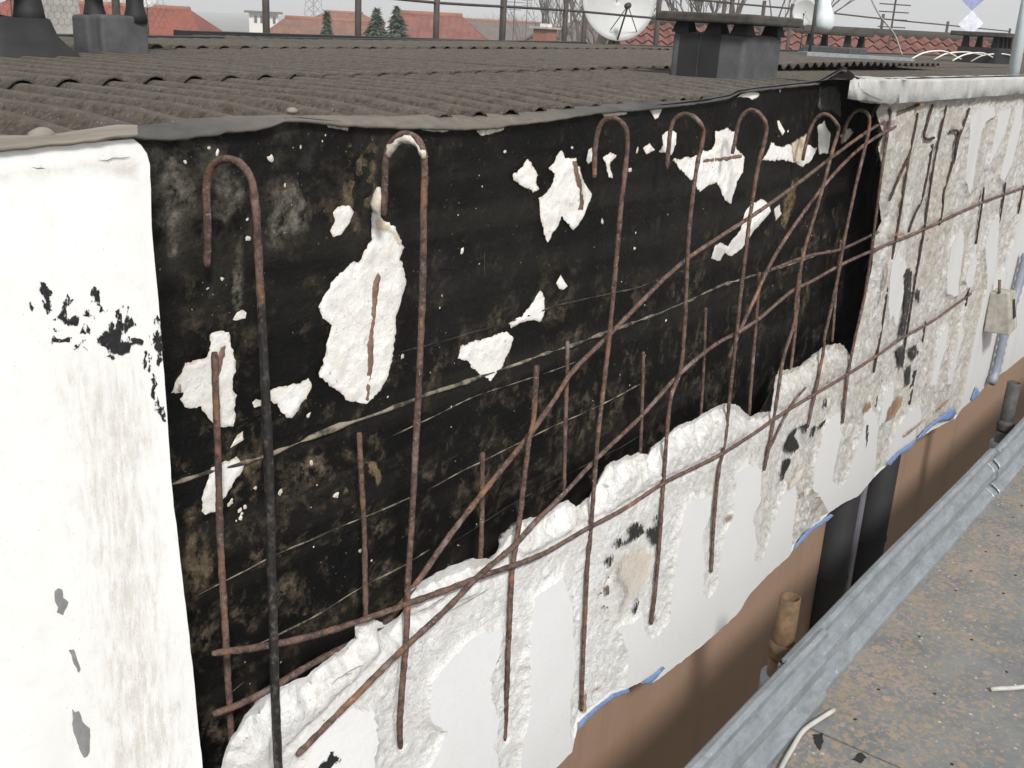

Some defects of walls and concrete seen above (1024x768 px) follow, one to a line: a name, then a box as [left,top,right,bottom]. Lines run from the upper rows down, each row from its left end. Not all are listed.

spalling [737,92,760,100]
leakage [161,157,195,257]
leakage [270,183,311,246]
leakage [343,146,376,231]
leakage [233,251,242,310]
peeling [50,286,166,422]
spalling [172,331,245,515]
leakage [368,462,381,484]
corrosion [201,102,1024,768]
spalling [221,94,1024,768]
leakage [183,533,213,589]
leakage [612,545,655,631]